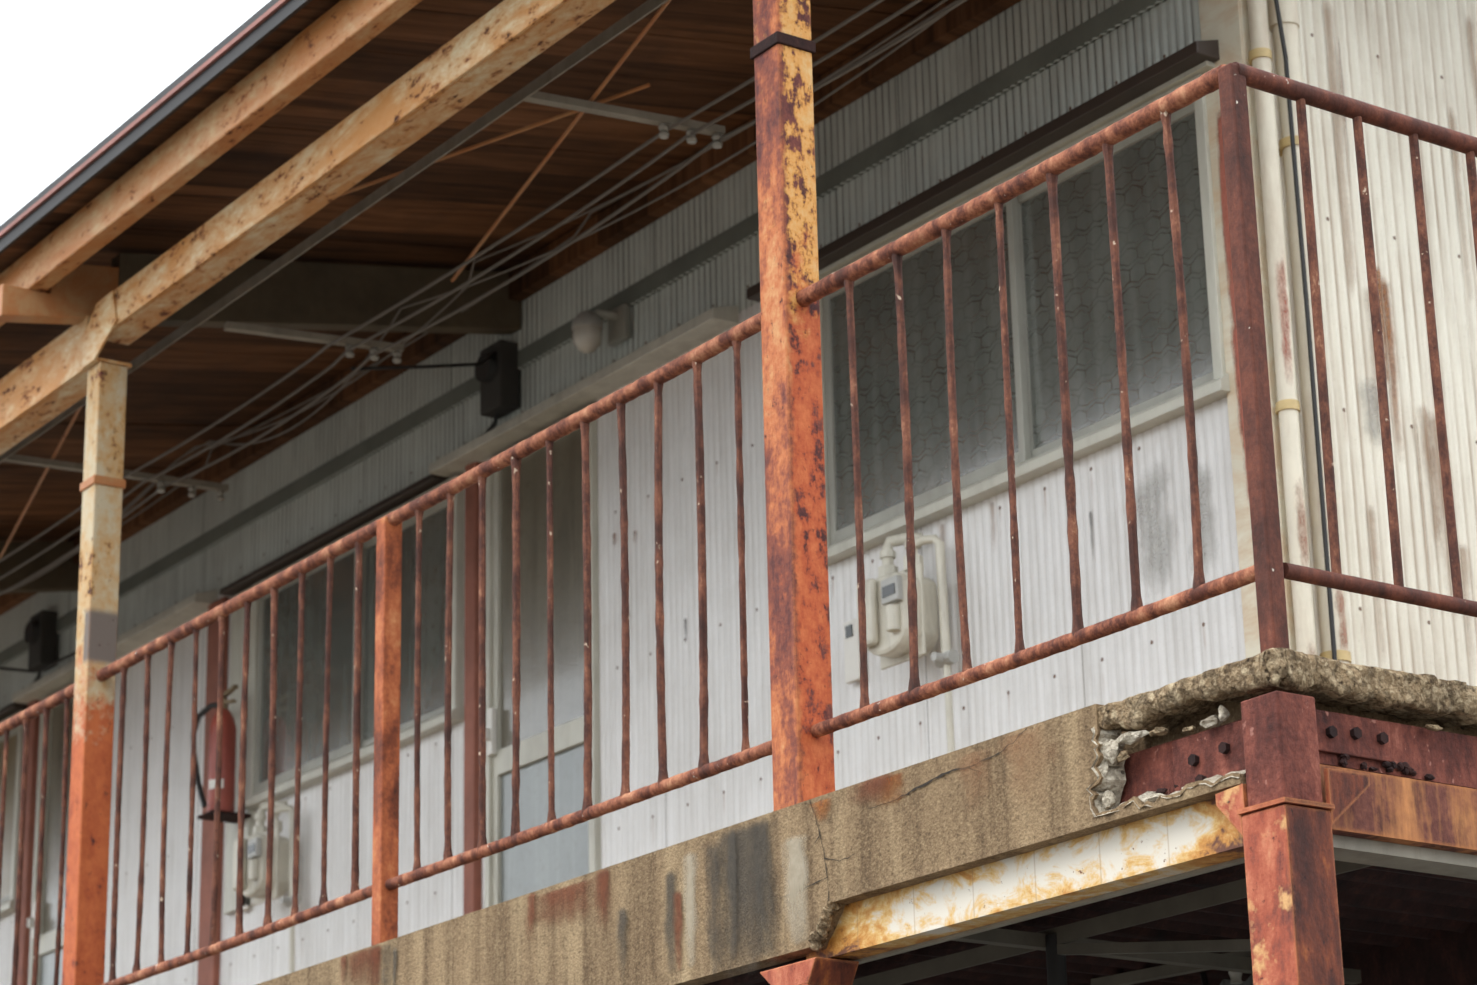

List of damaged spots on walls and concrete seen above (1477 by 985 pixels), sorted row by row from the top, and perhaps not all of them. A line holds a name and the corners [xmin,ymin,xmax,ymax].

crack [868,728,1027,809]
spalling [1086,705,1246,817]
spalling [1339,753,1435,780]
crack [774,801,854,901]
corrosion [528,870,608,923]